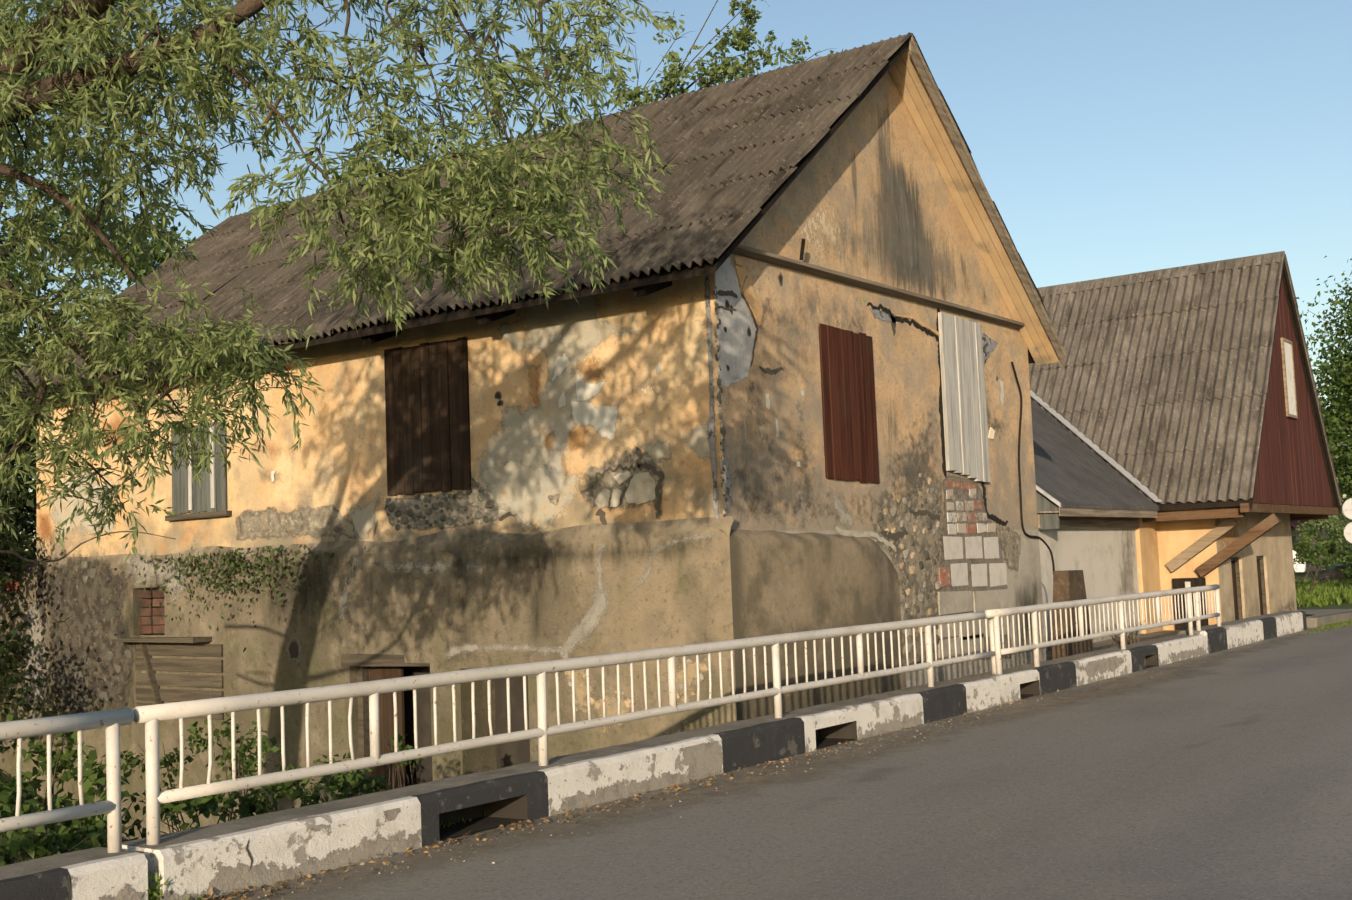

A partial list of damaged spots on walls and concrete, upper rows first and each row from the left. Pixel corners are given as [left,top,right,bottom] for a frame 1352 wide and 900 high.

damp [878,126,945,295]
peeling [236,294,671,540]
flaking render [683,256,763,519]
crack [867,302,947,478]
flaking render [834,471,1021,665]
crack [981,482,1008,526]
peeling [99,883,144,900]
peeling [160,807,421,900]
peeling [550,741,723,816]